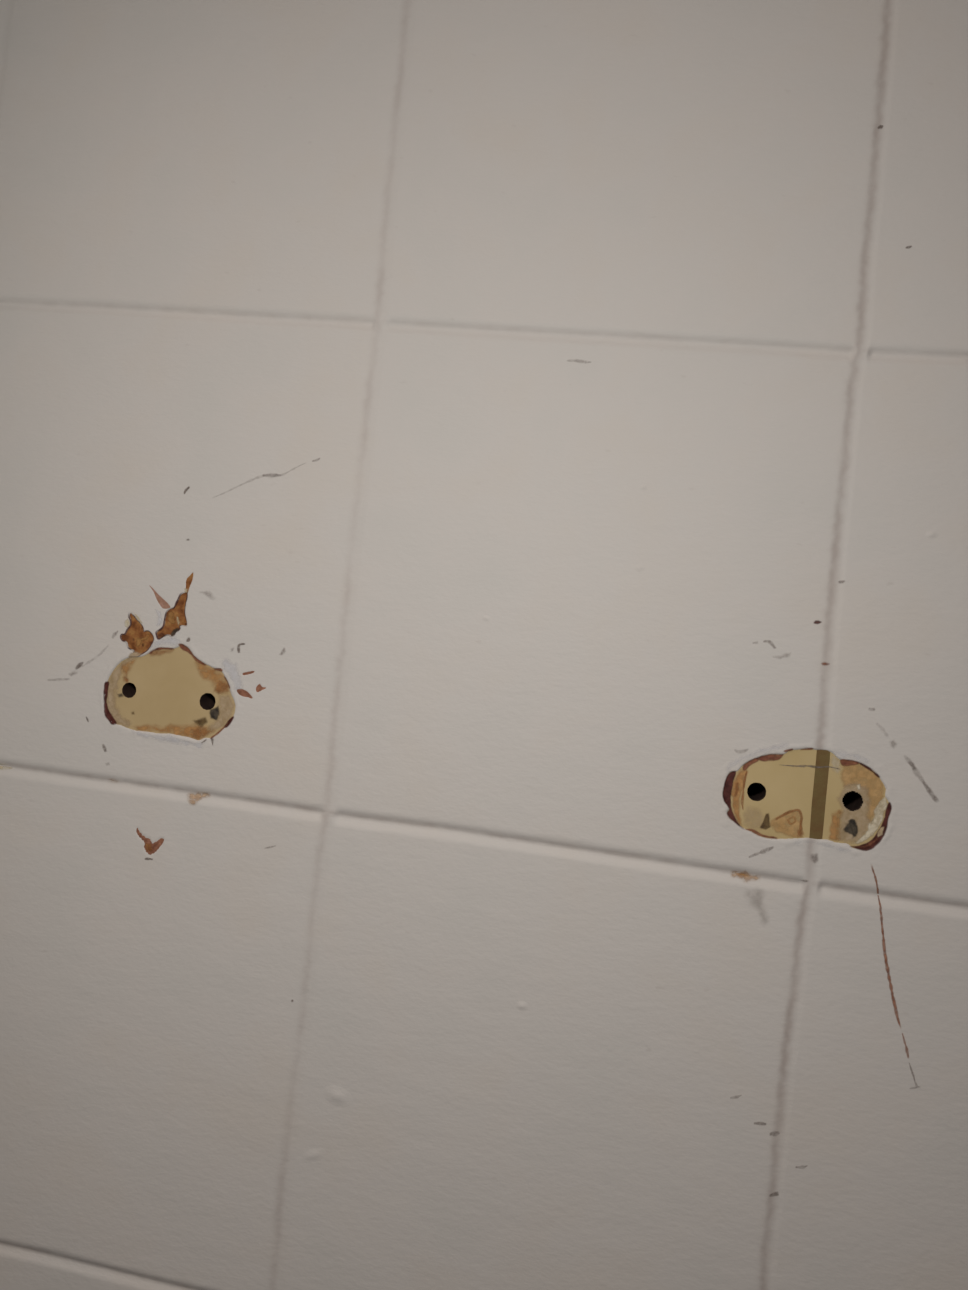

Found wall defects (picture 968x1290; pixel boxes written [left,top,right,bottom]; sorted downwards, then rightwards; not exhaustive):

peeling [95,573,266,750]
peeling [136,828,164,860]
peeling [712,738,902,862]
crack [872,868,915,1081]